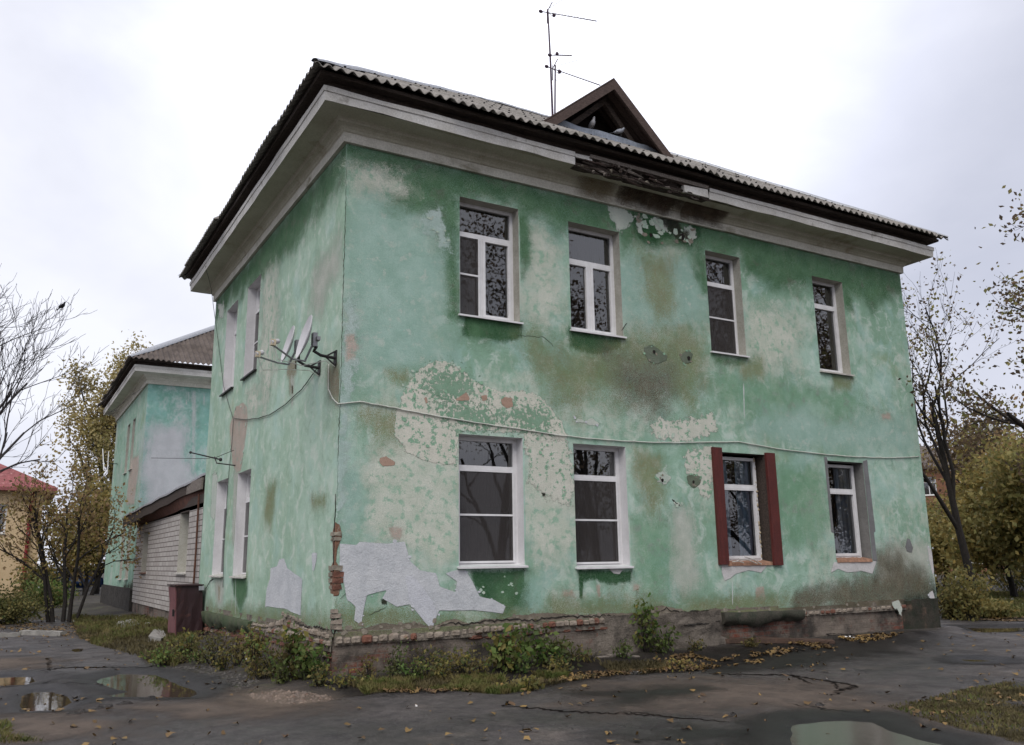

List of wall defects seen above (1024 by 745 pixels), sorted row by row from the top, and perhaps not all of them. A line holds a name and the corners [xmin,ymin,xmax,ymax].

flaking render [607,205,702,250]
flaking render [643,345,693,366]
peeling [328,290,366,601]
peeling [394,360,599,507]
peeling [650,412,718,499]
flaking render [252,586,771,642]
leakage [204,539,937,639]